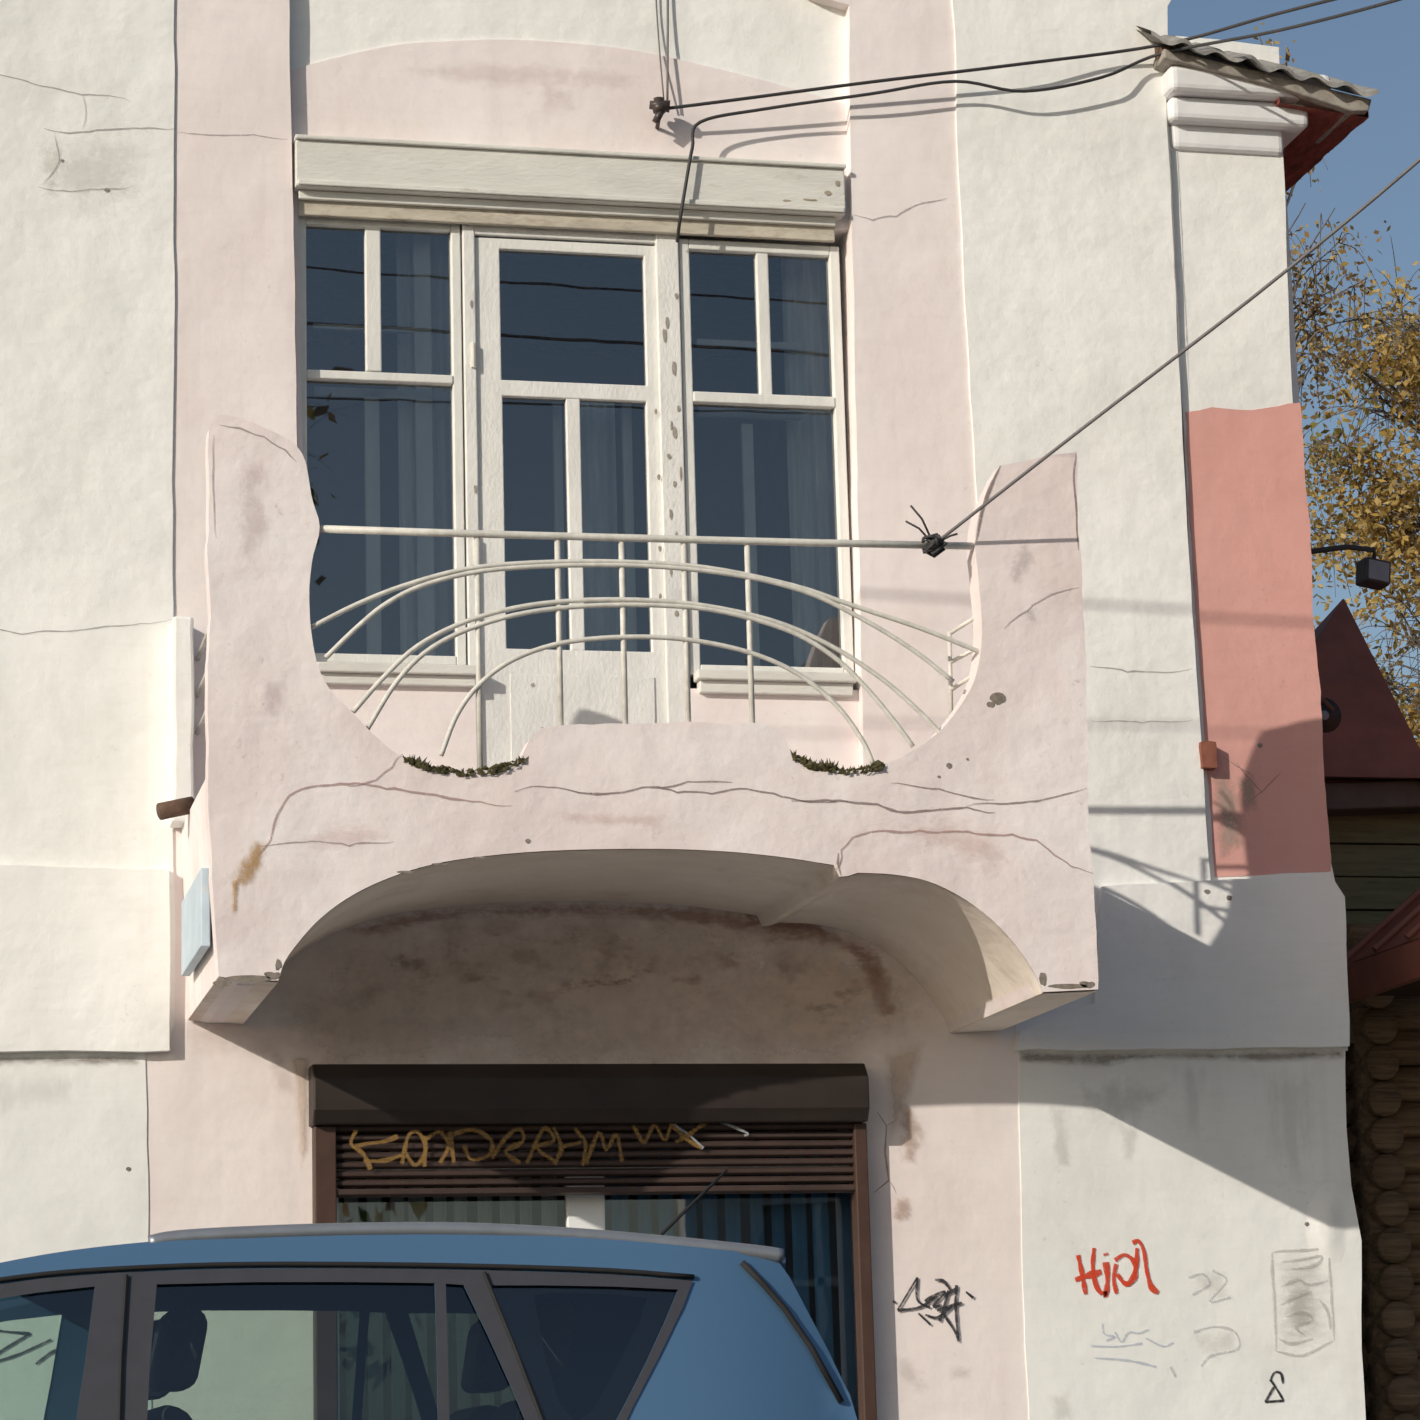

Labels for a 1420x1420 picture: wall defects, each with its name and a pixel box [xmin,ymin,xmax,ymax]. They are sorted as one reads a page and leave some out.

crack [0,74,279,192]
crack [0,619,170,635]
crack [259,754,1094,875]
corrosion [233,846,260,910]
water stain [303,936,894,1055]